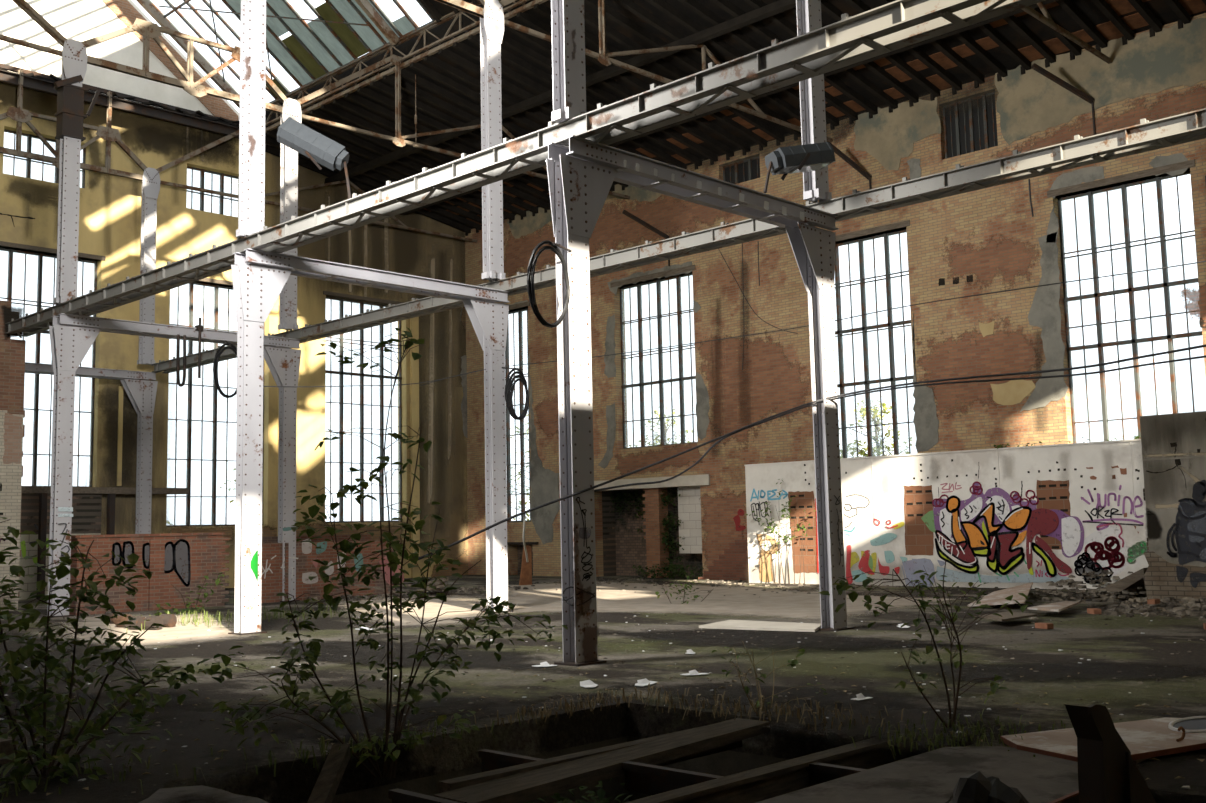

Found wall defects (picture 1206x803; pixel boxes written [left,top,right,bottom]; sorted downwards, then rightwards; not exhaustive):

peeling [854,97,942,180]
peeling [1149,153,1188,176]
spalling [911,166,1105,452]
corrosion [572,525,599,663]